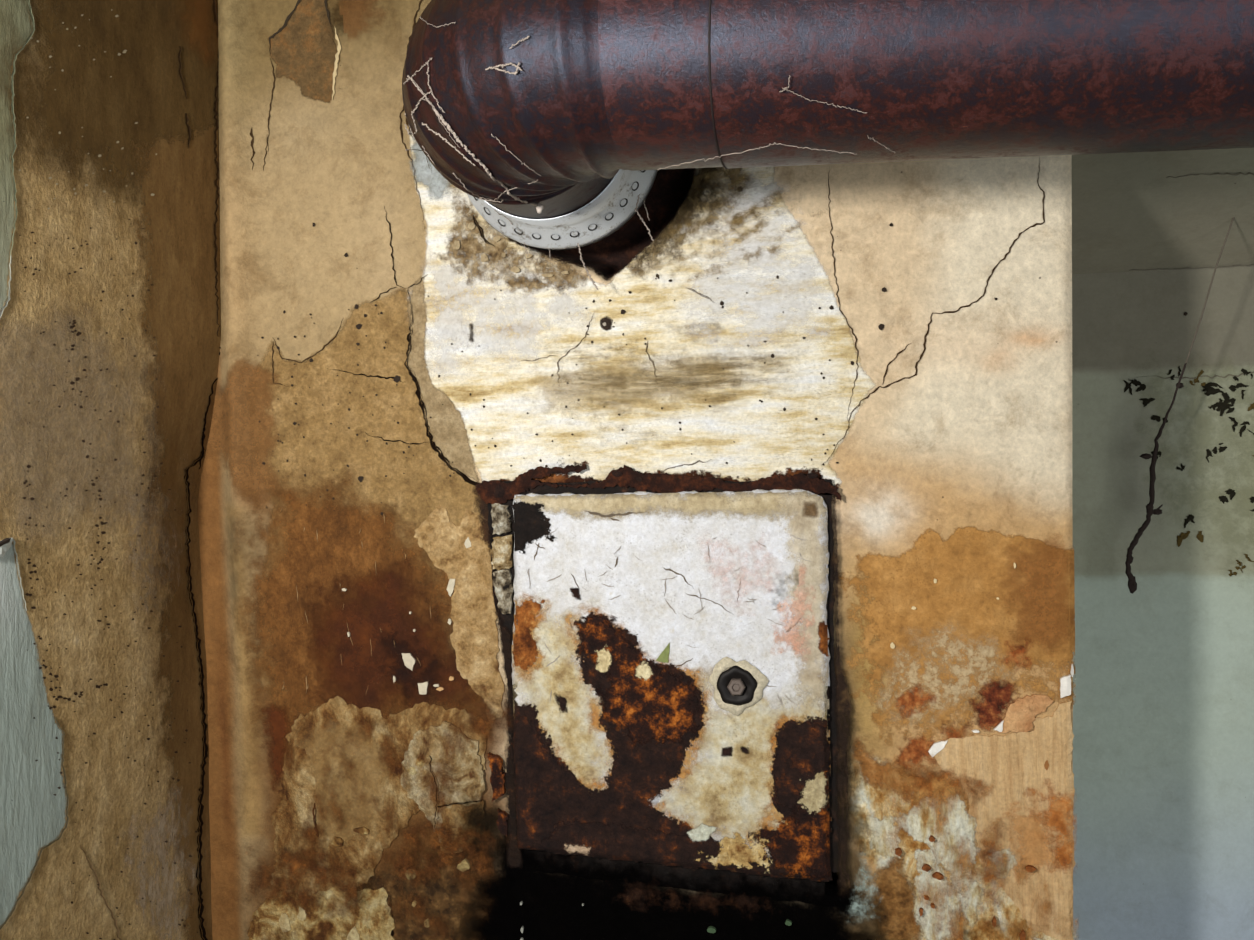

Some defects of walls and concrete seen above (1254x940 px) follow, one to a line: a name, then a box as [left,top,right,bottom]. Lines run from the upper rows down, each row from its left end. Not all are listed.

peeling [267,0,341,151]
peeling [0,0,221,940]
crack [178,0,221,940]
leakage [205,289,484,579]
crack [327,206,479,486]
peeling [408,130,875,492]
crack [823,156,1045,464]
mould [1123,379,1168,423]
mould [1168,366,1254,437]
peeling [247,506,505,940]
rust [242,461,855,940]
leakage [839,526,1076,748]